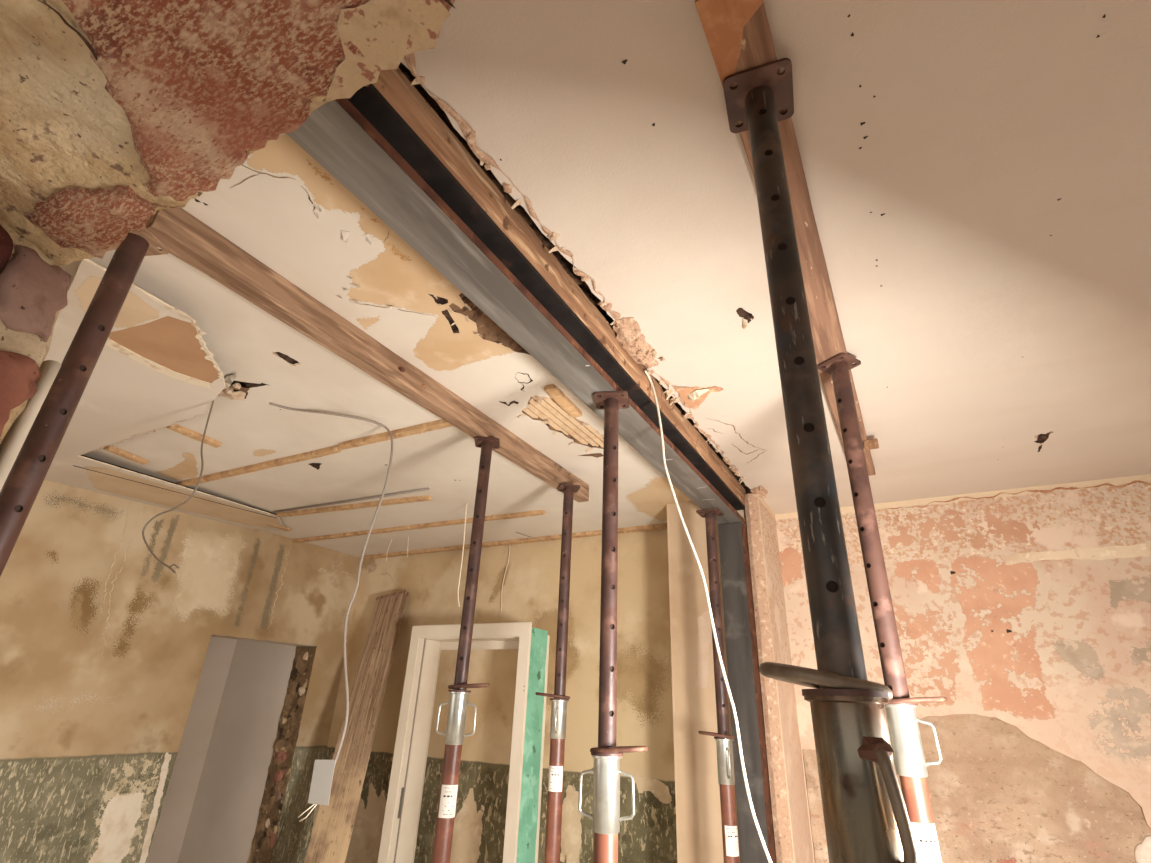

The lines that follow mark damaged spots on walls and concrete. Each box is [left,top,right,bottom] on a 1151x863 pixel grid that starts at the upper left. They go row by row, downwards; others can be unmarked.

peeling [247,133,514,371]
spalling [403,52,794,863]
leakage [68,577,102,636]
leakage [108,515,180,659]
leakage [260,544,285,630]
peeling [779,547,803,587]
spalling [885,505,1151,863]
peeling [88,752,171,863]
spalling [803,749,829,863]